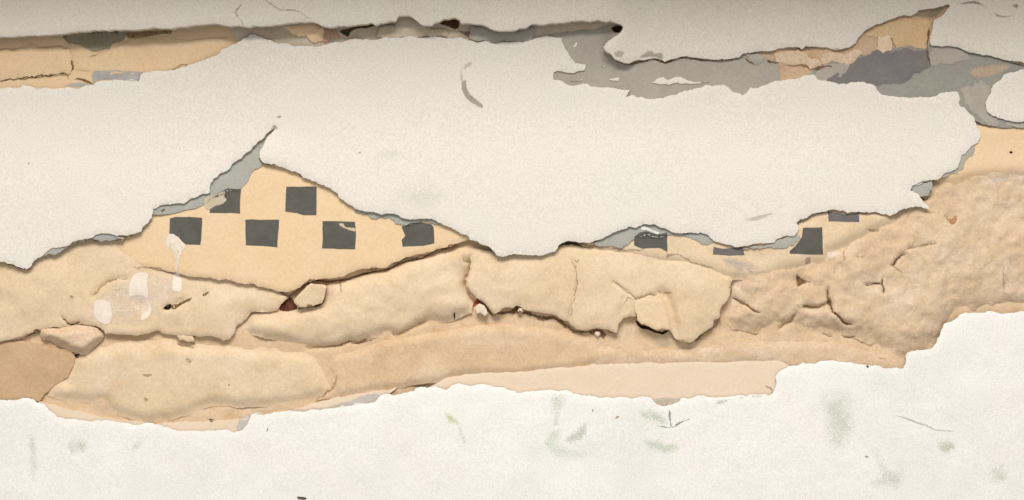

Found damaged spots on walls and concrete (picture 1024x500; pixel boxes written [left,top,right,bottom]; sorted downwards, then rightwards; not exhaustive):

spalling [0,25,237,89]
peeling [229,4,1024,185]
spalling [0,129,1024,432]
crack [288,241,867,344]
crack [866,243,937,293]